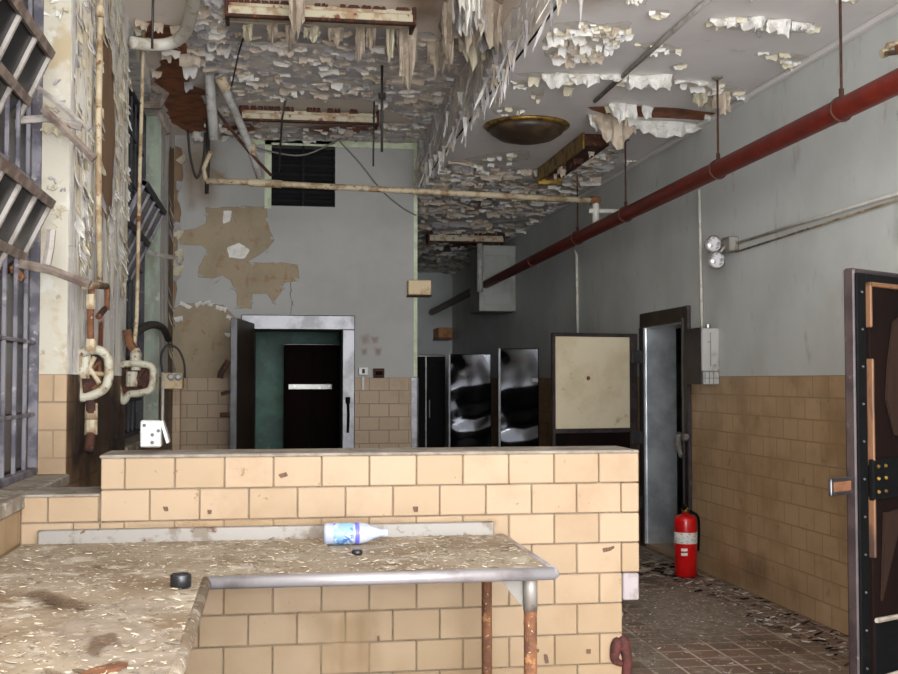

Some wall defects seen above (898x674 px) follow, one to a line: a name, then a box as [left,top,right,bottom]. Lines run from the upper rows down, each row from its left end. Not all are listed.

peeling [40,0,181,302]
flaking render [168,146,300,377]
peeling [161,0,748,275]
peeling [706,16,822,39]
peeling [755,52,808,71]